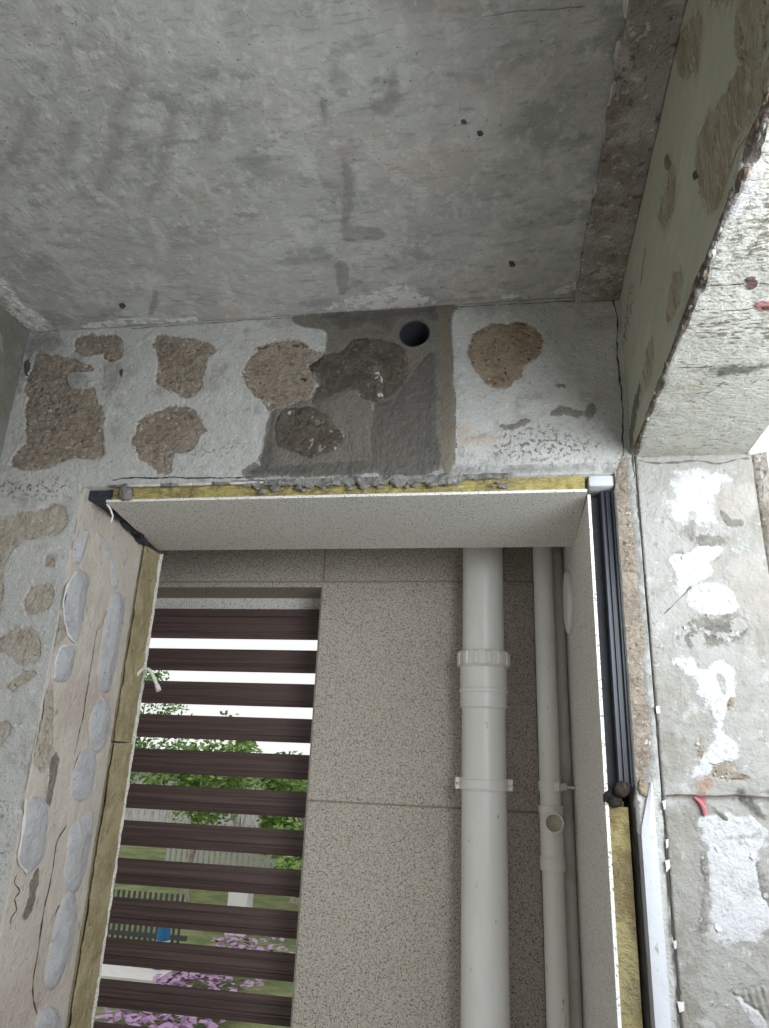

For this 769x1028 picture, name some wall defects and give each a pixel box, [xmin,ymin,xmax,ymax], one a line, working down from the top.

spalling [459,117,485,137]
flaking render [127,330,261,477]
flaking render [239,336,407,459]
flaking render [464,0,769,786]
flaking render [0,330,126,776]